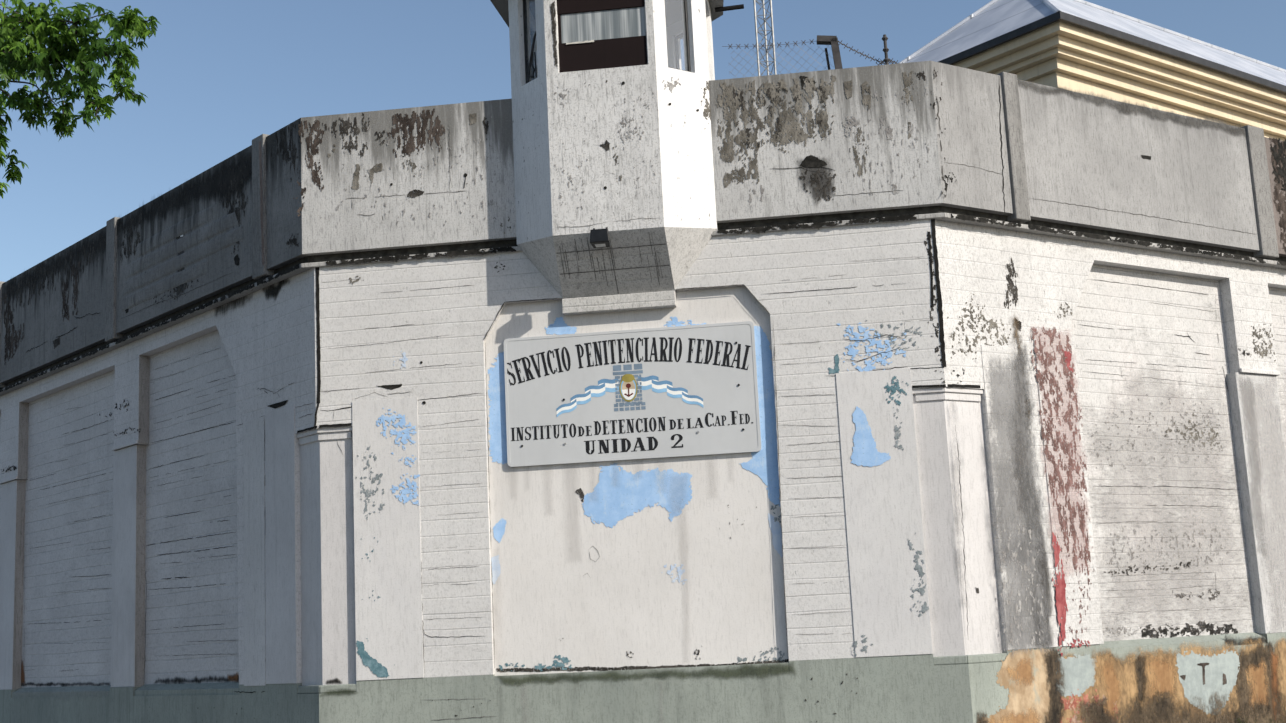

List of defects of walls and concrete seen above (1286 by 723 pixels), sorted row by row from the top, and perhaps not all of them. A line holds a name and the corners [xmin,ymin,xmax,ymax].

leakage [7,156,252,299]
leakage [799,160,836,201]
peeling [701,70,946,213]
leakage [1269,137,1286,251]
leakage [0,237,299,392]
crack [144,267,559,672]
peeling [488,351,507,464]
peeling [575,463,692,528]
peeling [741,326,783,557]
crack [675,67,1252,653]
leakage [988,317,1052,653]
peeling [828,235,1240,723]